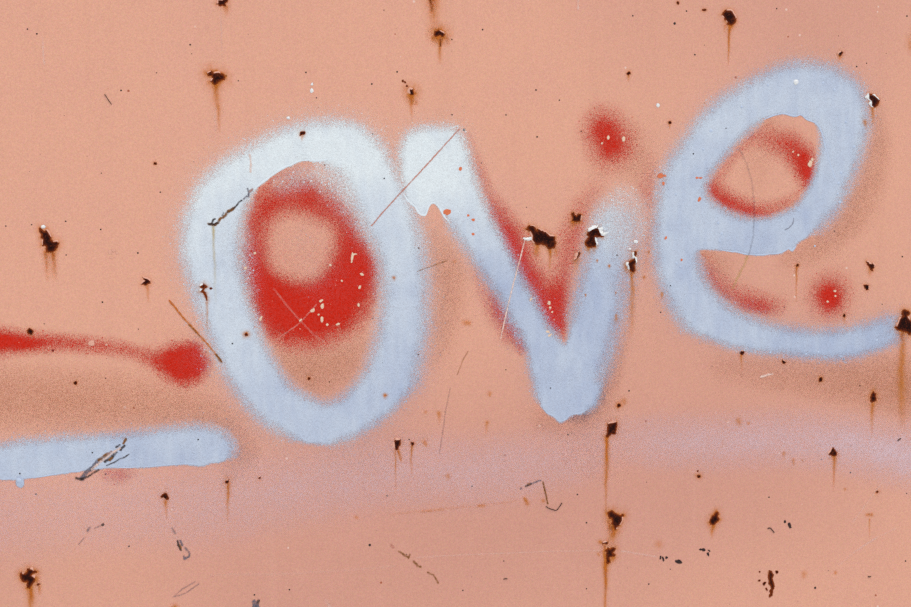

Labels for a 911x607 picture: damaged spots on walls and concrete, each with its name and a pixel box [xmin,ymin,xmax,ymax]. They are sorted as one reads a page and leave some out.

corrosion [433,27,446,53]
corrosion [722,9,737,53]
corrosion [205,69,227,108]
corrosion [864,93,880,125]
corrosion [39,225,59,266]
corrosion [523,225,557,256]
corrosion [571,212,609,260]
corrosion [895,309,911,400]
corrosion [605,421,617,488]
corrosion [709,510,721,533]
corrosion [599,510,625,601]
corrosion [19,567,40,607]